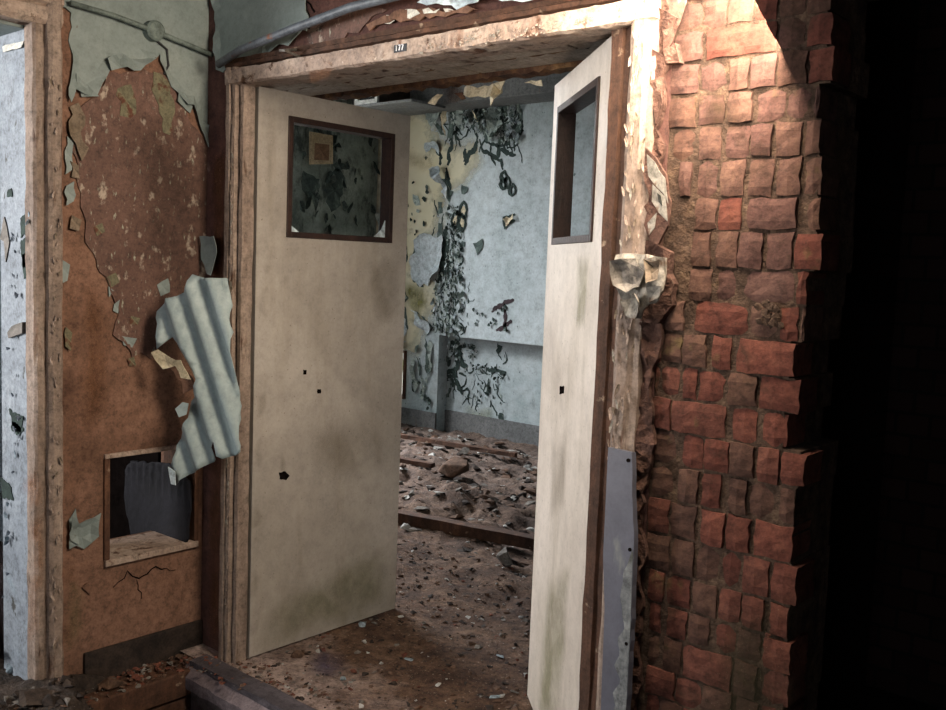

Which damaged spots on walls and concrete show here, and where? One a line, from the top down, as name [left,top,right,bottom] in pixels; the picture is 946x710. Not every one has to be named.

peeling [2,41,24,52]
peeling [424,81,524,166]
flaking render [48,0,479,359]
peeling [10,212,30,299]
peeling [404,166,508,420]
flaking render [607,0,687,710]
peeling [9,393,24,458]
peeling [0,470,15,519]
crack [113,566,174,599]